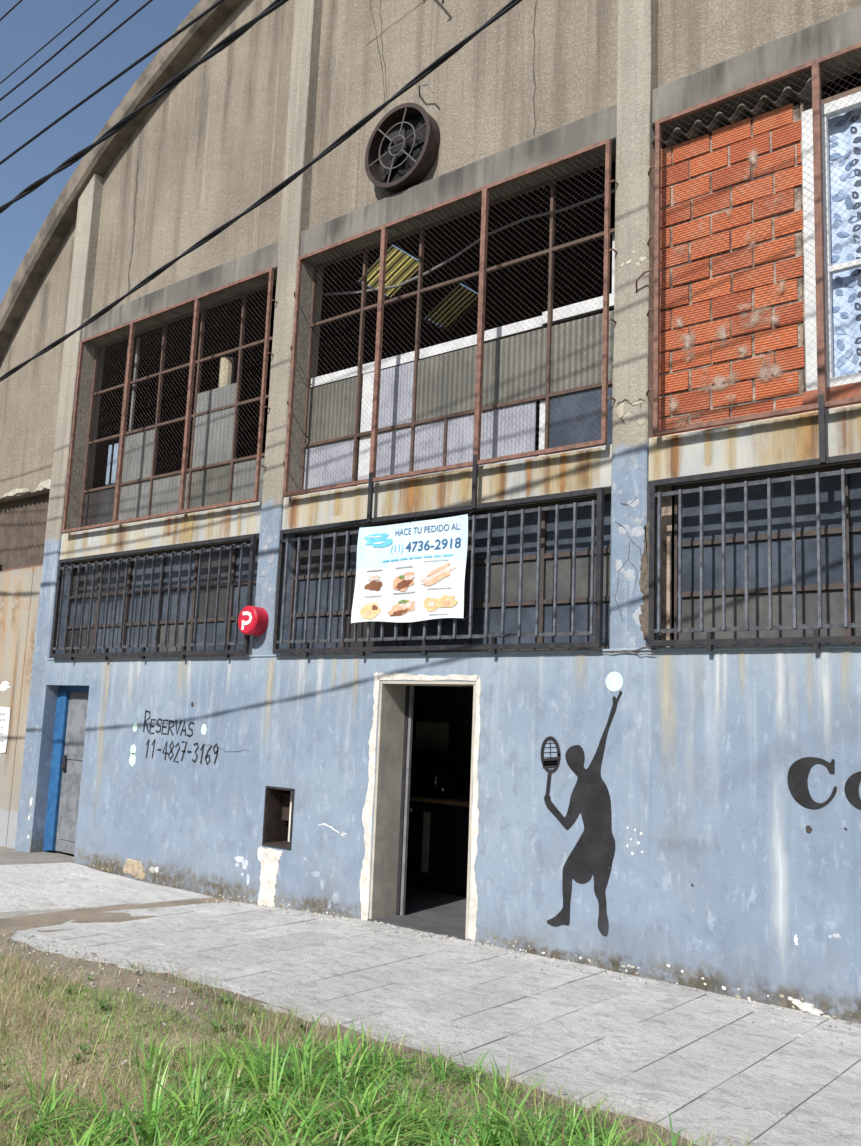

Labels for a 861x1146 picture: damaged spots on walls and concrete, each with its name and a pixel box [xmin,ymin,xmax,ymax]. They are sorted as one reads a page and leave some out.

crack [364,0,426,111]
flaking render [616,401,645,426]
flaking render [0,479,51,499]
rust [496,463,505,500]
rust [546,449,592,494]
rust [671,435,679,478]
spalling [615,522,649,640]
leakage [92,858,123,876]
peeling [205,672,855,1044]
leakage [524,947,565,960]
leakage [674,972,722,994]
leakage [758,990,800,1010]